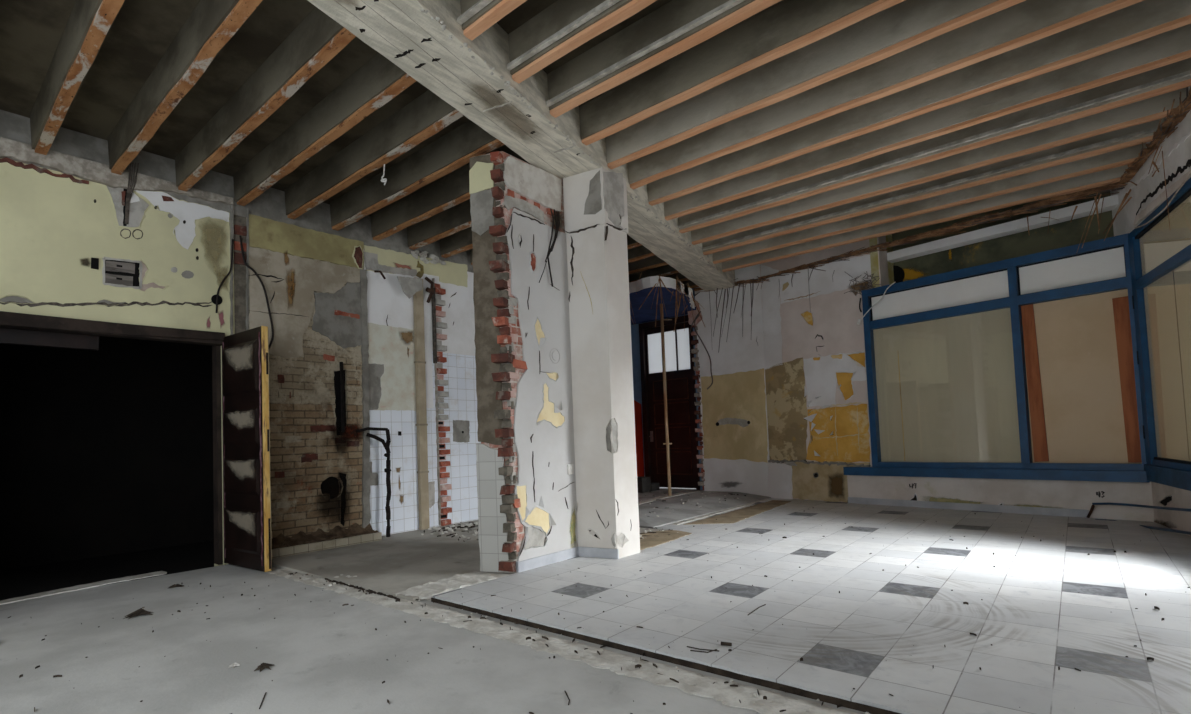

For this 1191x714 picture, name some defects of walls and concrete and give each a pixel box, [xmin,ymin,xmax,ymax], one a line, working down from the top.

peeling [105,185,230,250]
flaking render [529,251,537,274]
crack [0,300,212,308]
spalling [323,354,347,425]
peeling [334,310,416,411]
spalling [428,278,470,526]
peeling [536,372,565,429]
peeling [804,352,866,456]
peeling [370,461,379,487]
peeling [516,484,556,550]